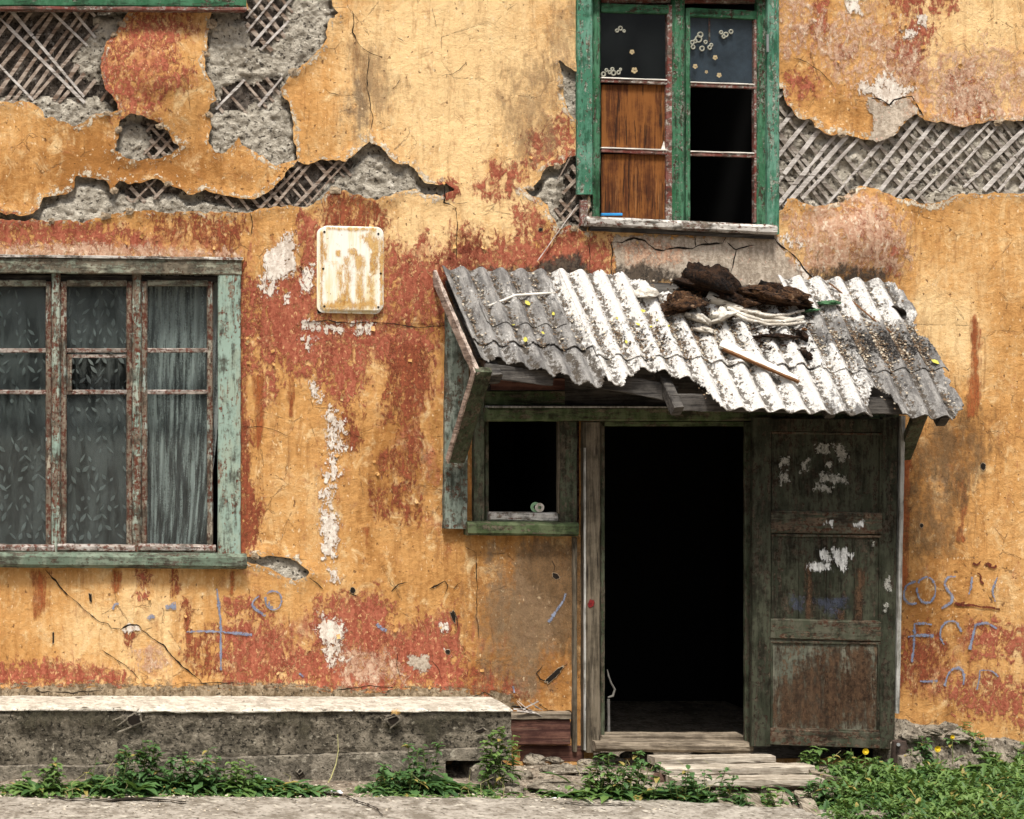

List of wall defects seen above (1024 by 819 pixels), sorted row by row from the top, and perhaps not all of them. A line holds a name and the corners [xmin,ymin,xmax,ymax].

corrosion [320,227,384,310]
flaking render [0,0,1024,592]
crack [589,236,812,277]
peeling [131,568,154,602]
peeling [170,569,181,597]
crack [46,571,236,686]
flaking render [0,582,530,708]
crack [39,688,99,696]